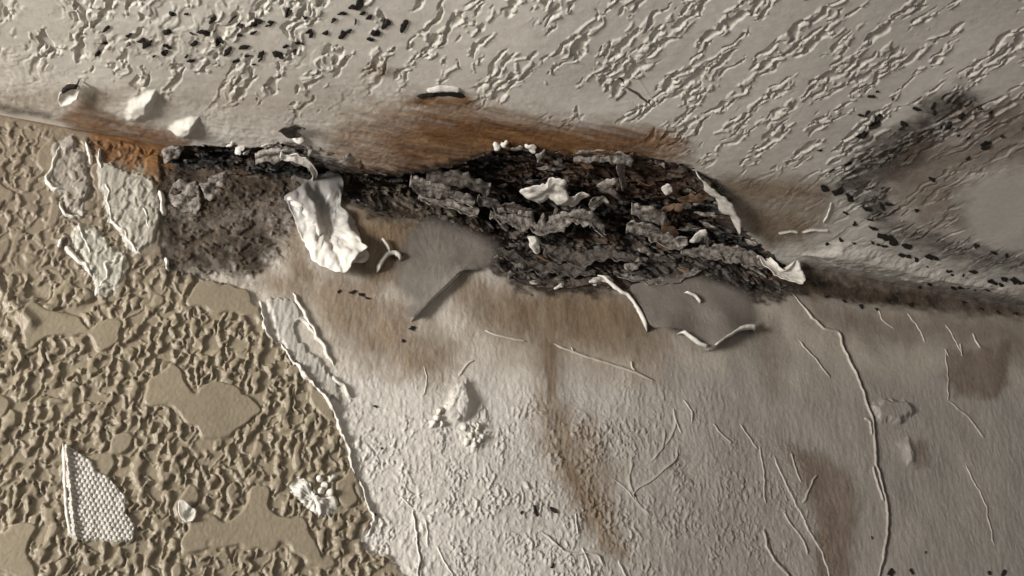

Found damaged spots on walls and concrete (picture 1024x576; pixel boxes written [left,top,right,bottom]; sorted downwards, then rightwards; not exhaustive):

damp [125,11,189,58]
damp [184,0,409,66]
corrosion [61,107,188,175]
damp [285,143,486,178]
damp [319,192,483,370]
spalling [44,124,806,352]
corrosion [340,98,679,172]
damp [460,249,637,345]
damp [696,90,1024,316]
flaking render [259,292,378,538]
crack [792,293,891,576]
peeling [178,500,197,523]